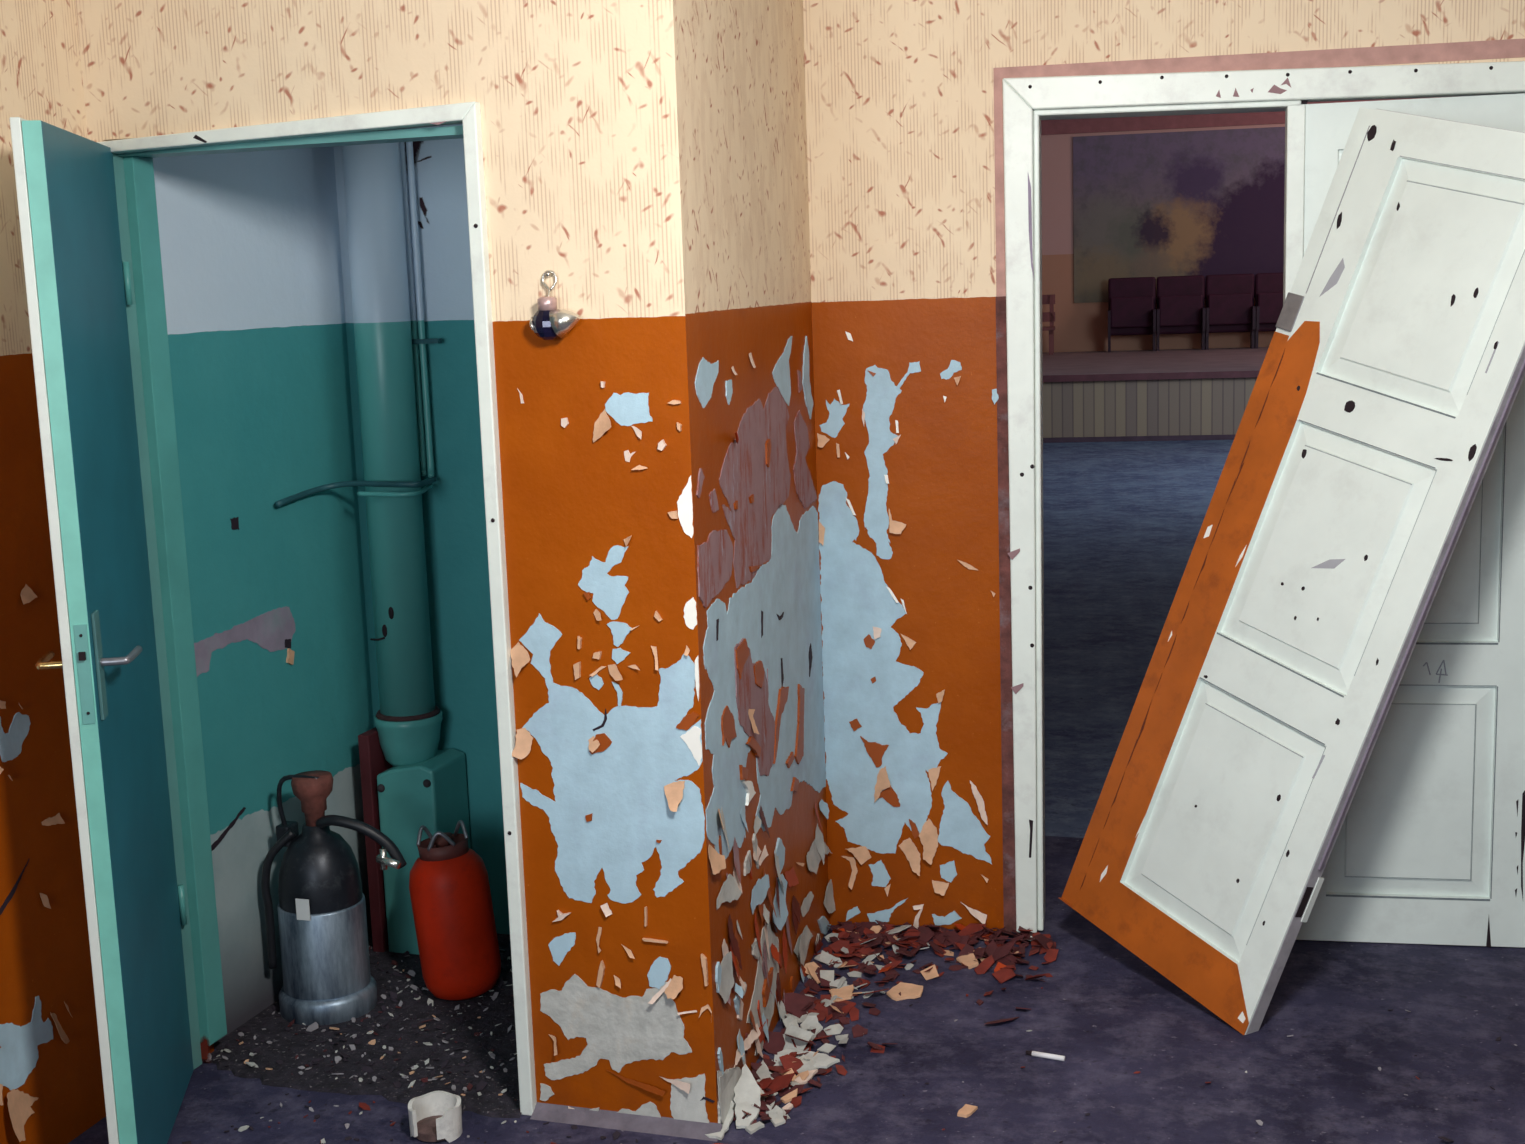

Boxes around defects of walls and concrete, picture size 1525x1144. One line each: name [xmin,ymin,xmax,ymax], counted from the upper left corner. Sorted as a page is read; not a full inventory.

peeling [21,584,37,605]
peeling [286,648,295,665]
peeling [0,700,31,781]
peeling [510,336,992,1124]
peeling [41,813,65,826]
spalling [0,859,29,915]
peeling [0,996,73,1142]